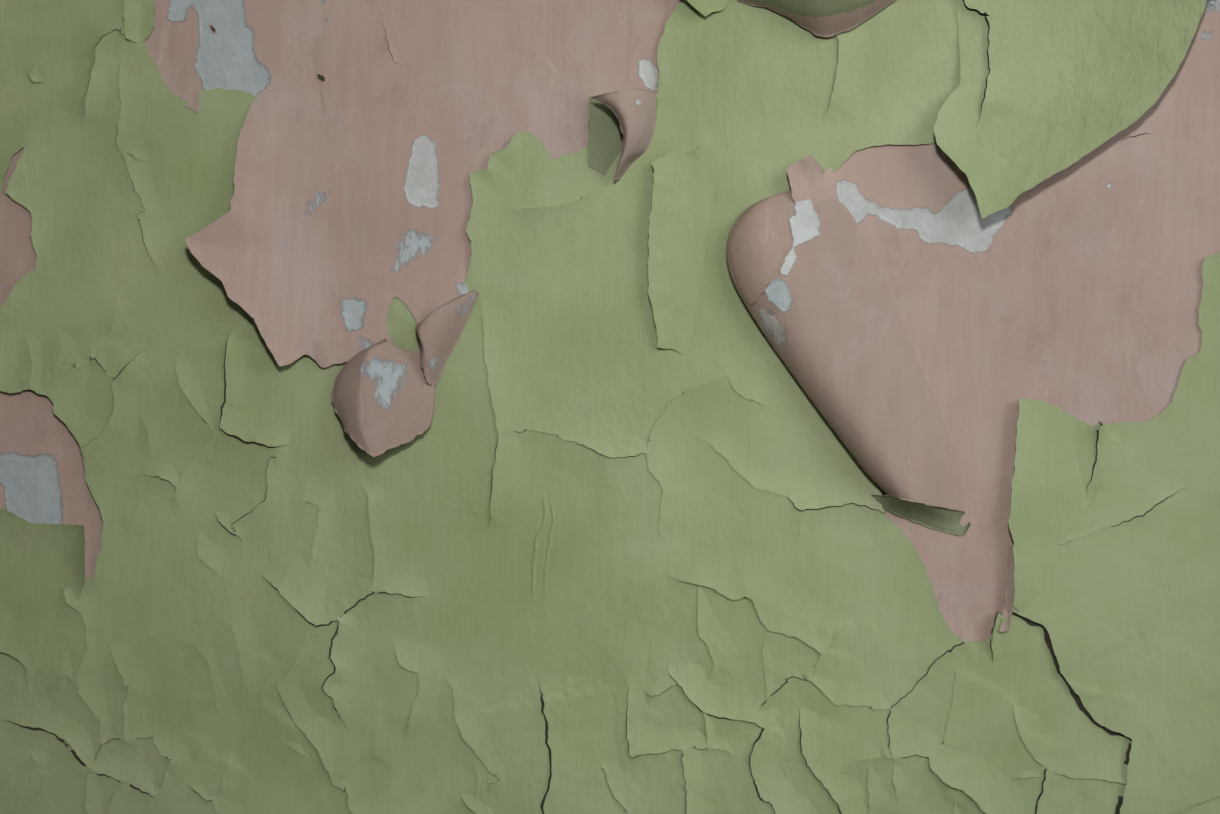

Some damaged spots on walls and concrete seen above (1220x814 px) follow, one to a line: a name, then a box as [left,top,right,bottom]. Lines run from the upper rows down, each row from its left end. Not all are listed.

peeling [0,147,37,308]
peeling [0,389,103,578]
peeling [123,0,730,368]
crack [0,297,1220,814]
peeling [787,0,1220,642]